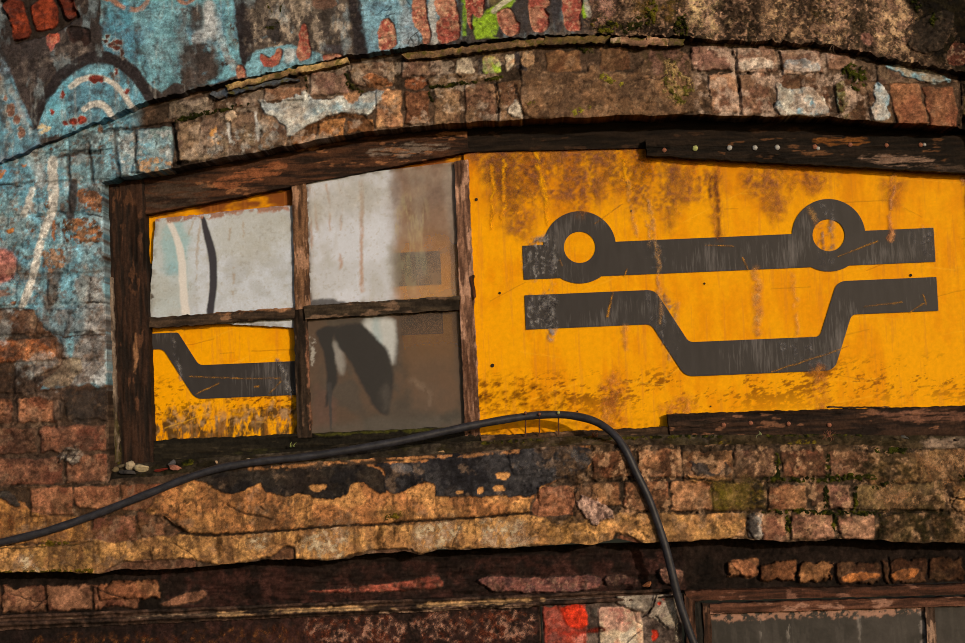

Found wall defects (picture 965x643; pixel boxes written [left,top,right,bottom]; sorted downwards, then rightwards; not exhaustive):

flaking render [0,0,124,84]
flaking render [377,18,397,51]
flaking render [411,0,485,44]
flaking render [497,0,583,37]
leakage [598,0,612,20]
leakage [638,0,718,32]
leakage [734,0,848,45]
leakage [872,0,965,68]
peeling [258,73,393,145]
spalling [112,460,181,475]
peeling [195,445,592,518]
flaking render [104,558,196,572]